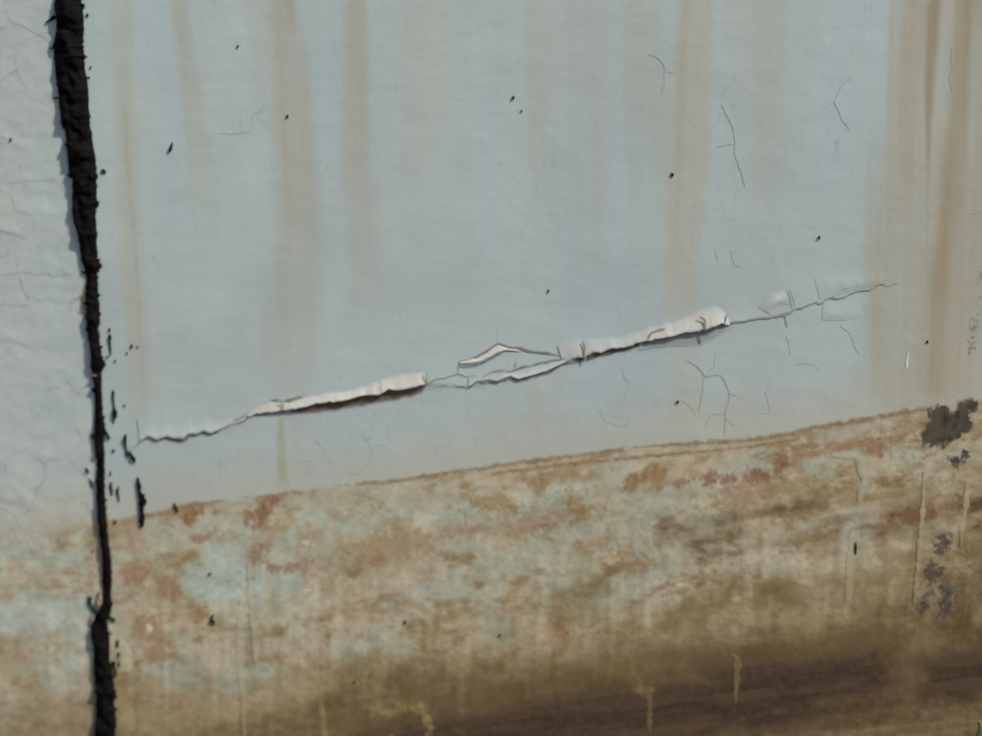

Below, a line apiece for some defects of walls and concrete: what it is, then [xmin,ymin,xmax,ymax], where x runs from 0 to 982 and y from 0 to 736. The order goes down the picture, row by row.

corrosion [333,0,982,522]
water stain [485,369,567,453]
water stain [660,345,708,442]
corrosion [113,488,449,671]
water stain [212,396,982,736]